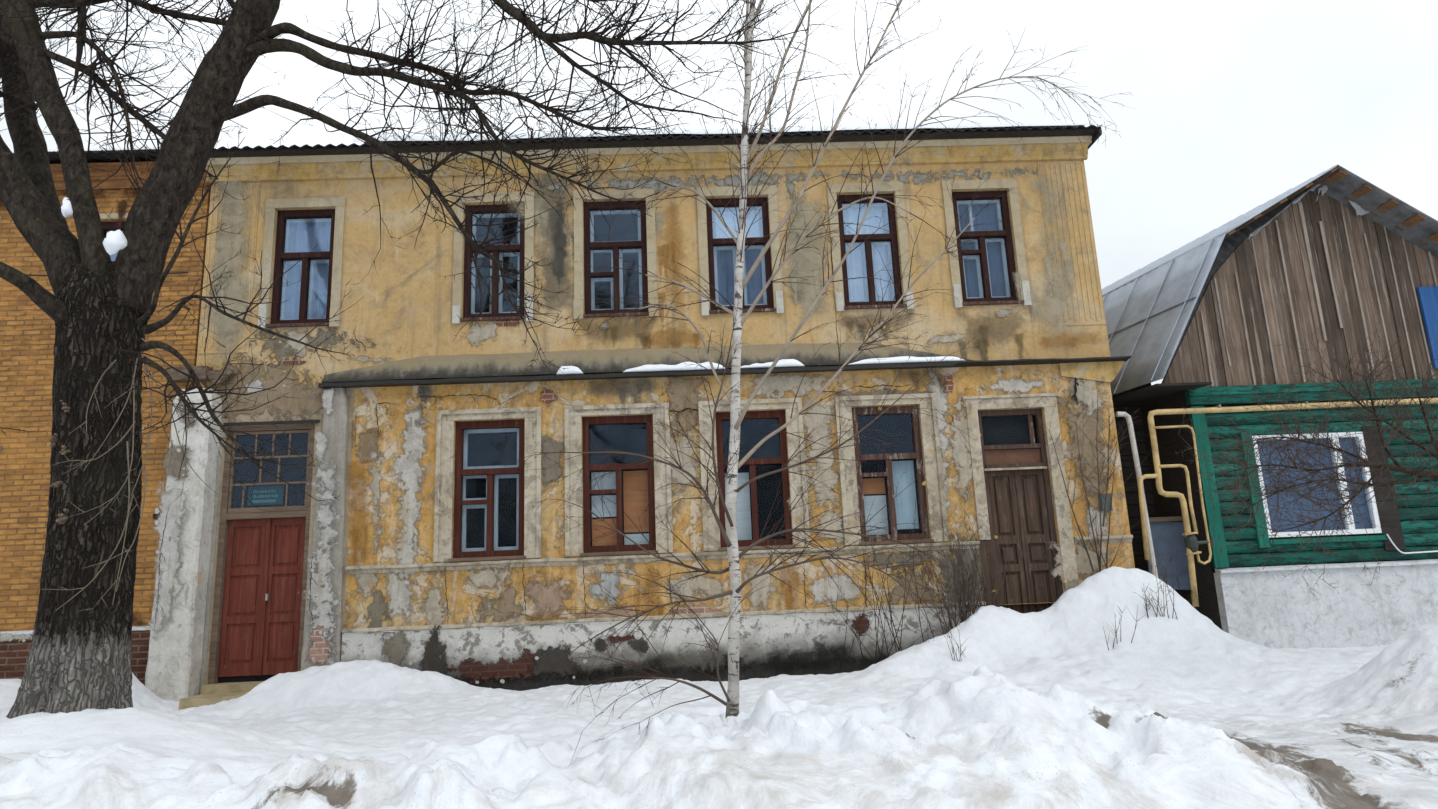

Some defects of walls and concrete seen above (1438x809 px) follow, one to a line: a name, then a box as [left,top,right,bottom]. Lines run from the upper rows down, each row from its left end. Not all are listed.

damp [530,176,574,305]
peeling [148,441,191,640]
spalling [204,181,650,685]
spalling [662,377,708,494]
peeling [666,571,724,620]
peeling [742,558,781,616]
peeling [807,566,870,638]
peeling [742,368,998,605]